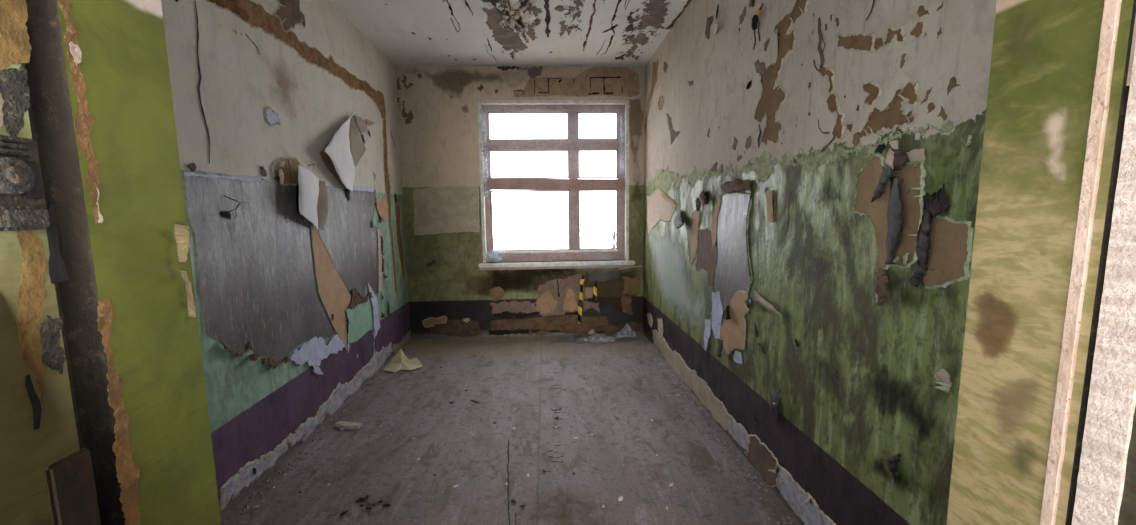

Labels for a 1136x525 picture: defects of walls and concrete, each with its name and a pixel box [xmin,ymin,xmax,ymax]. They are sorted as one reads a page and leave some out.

crack [195,1,210,163]
peeling [481,0,577,52]
flaking render [513,0,670,135]
peeling [644,0,973,356]
peeling [220,181,480,511]
flaking render [527,274,836,525]
damp [874,368,928,438]